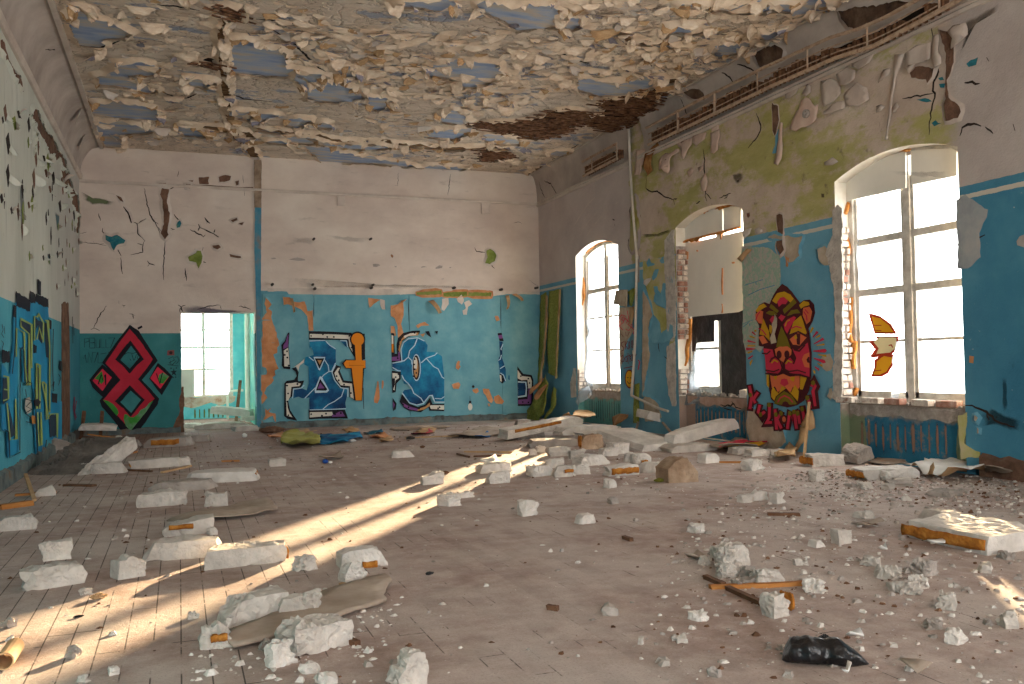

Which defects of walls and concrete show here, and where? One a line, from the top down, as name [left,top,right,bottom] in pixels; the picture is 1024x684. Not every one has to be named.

spalling [59,0,912,176]
spalling [771,22,968,165]
crack [902,68,939,134]
crack [960,123,1015,135]
crack [646,150,731,205]
crack [123,194,160,266]
crack [191,218,220,237]
spalling [956,195,988,269]
spalling [0,103,83,438]
spalling [613,193,815,452]
spalling [737,205,983,459]
crack [965,405,1014,427]